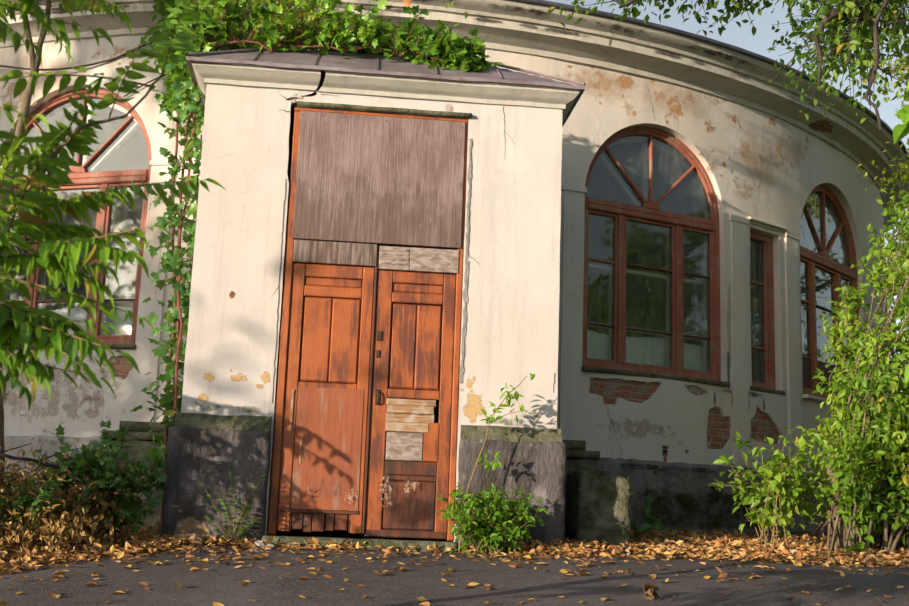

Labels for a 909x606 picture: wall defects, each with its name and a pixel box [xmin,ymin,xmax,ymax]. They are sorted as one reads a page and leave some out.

crack [280,71,337,112]
peeling [580,66,636,116]
peeling [651,79,691,124]
peeling [3,353,133,419]
peeling [460,377,486,423]
spalling [589,377,661,405]
spalling [707,405,730,449]
spalling [750,405,780,444]